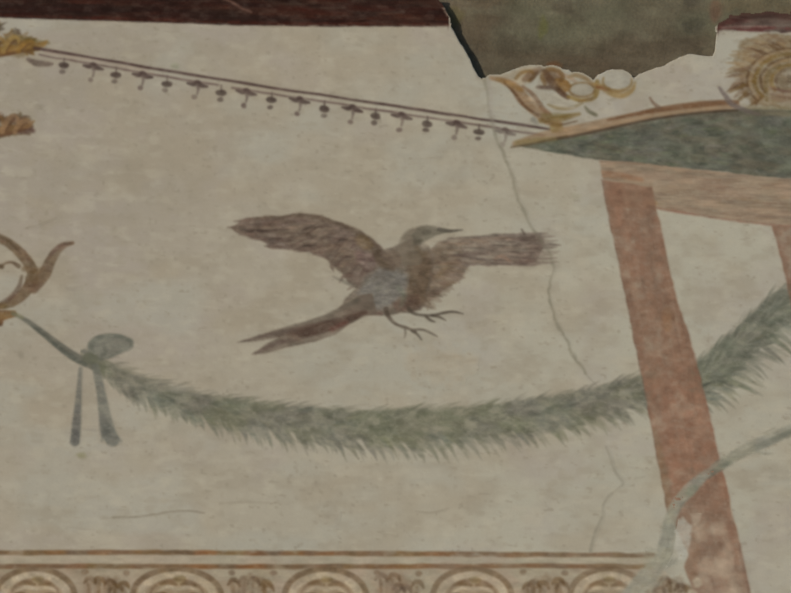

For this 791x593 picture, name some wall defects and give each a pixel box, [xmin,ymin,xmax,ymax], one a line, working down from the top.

crack [481,76,598,387]
crack [587,445,658,554]
crack [615,422,791,593]